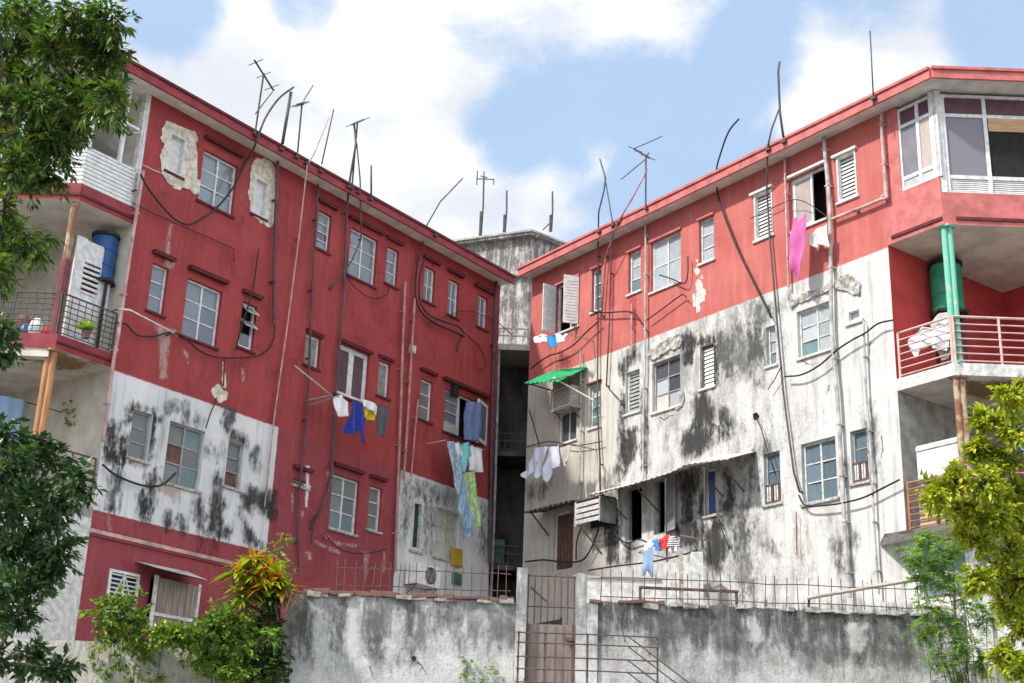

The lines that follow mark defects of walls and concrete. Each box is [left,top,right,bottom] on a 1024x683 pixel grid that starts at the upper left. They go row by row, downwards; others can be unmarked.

peeling [160,121,201,195]
peeling [248,158,276,228]
peeling [692,259,706,313]
damp [103,402,278,552]
damp [603,345,649,565]
damp [676,294,790,597]
damp [865,402,877,473]
damp [403,480,449,553]
damp [300,598,326,659]
damp [340,596,404,661]
damp [742,616,764,645]
damp [826,614,867,651]